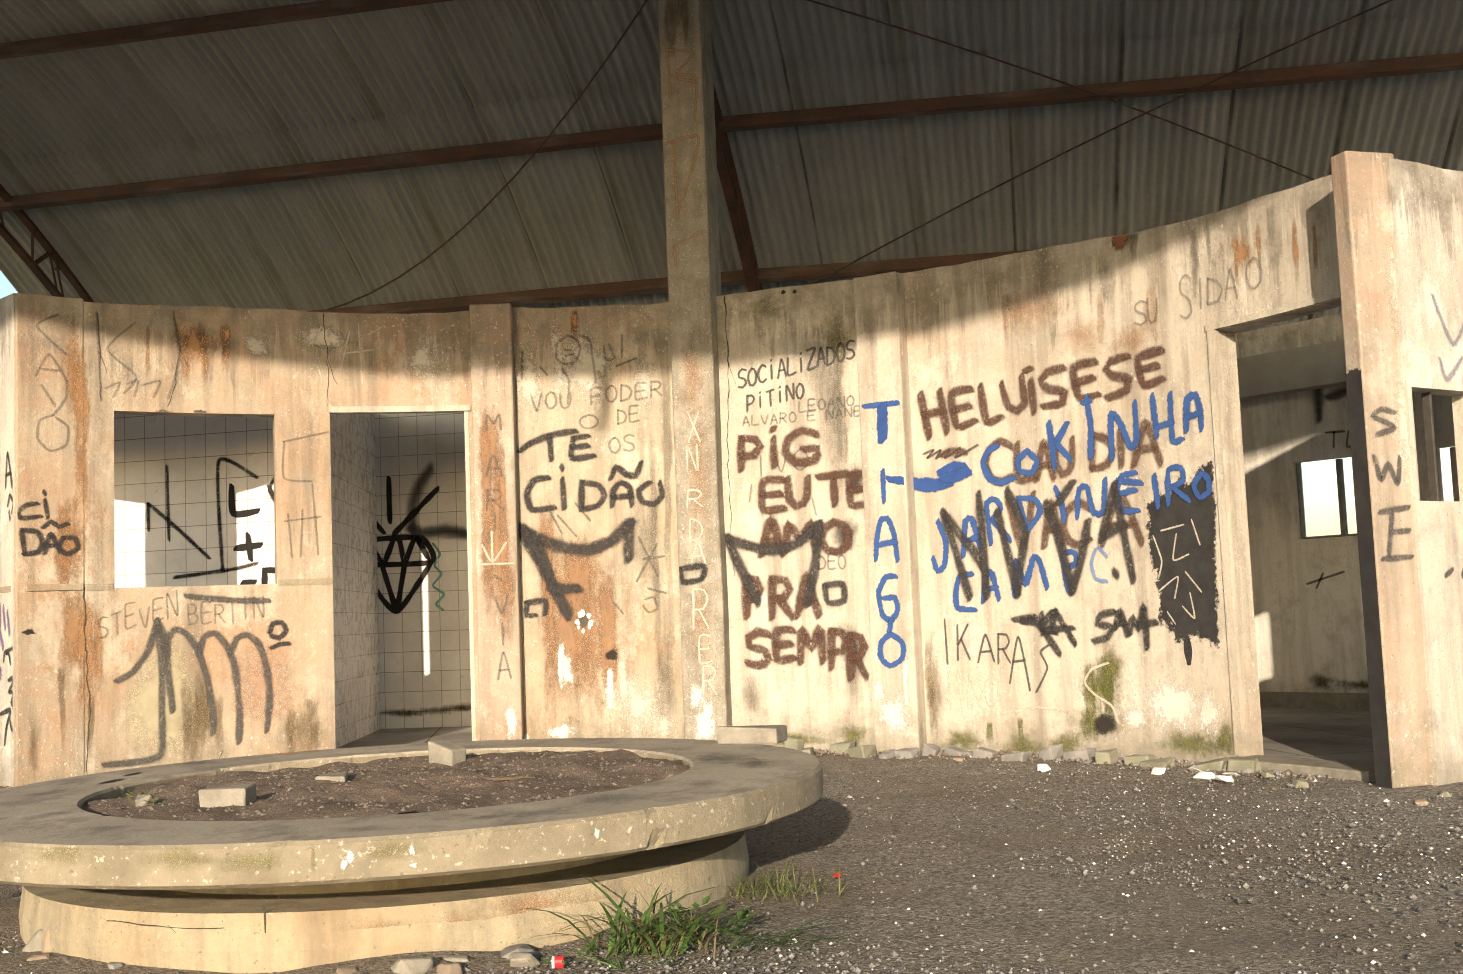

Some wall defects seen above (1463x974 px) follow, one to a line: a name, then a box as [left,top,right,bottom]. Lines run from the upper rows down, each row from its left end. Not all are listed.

rust [1233,231,1261,276]
rust [1292,226,1317,264]
rust [179,328,230,374]
rust [64,339,89,497]
rust [55,510,83,584]
rust [64,602,102,704]
water stain [1014,653,1119,752]